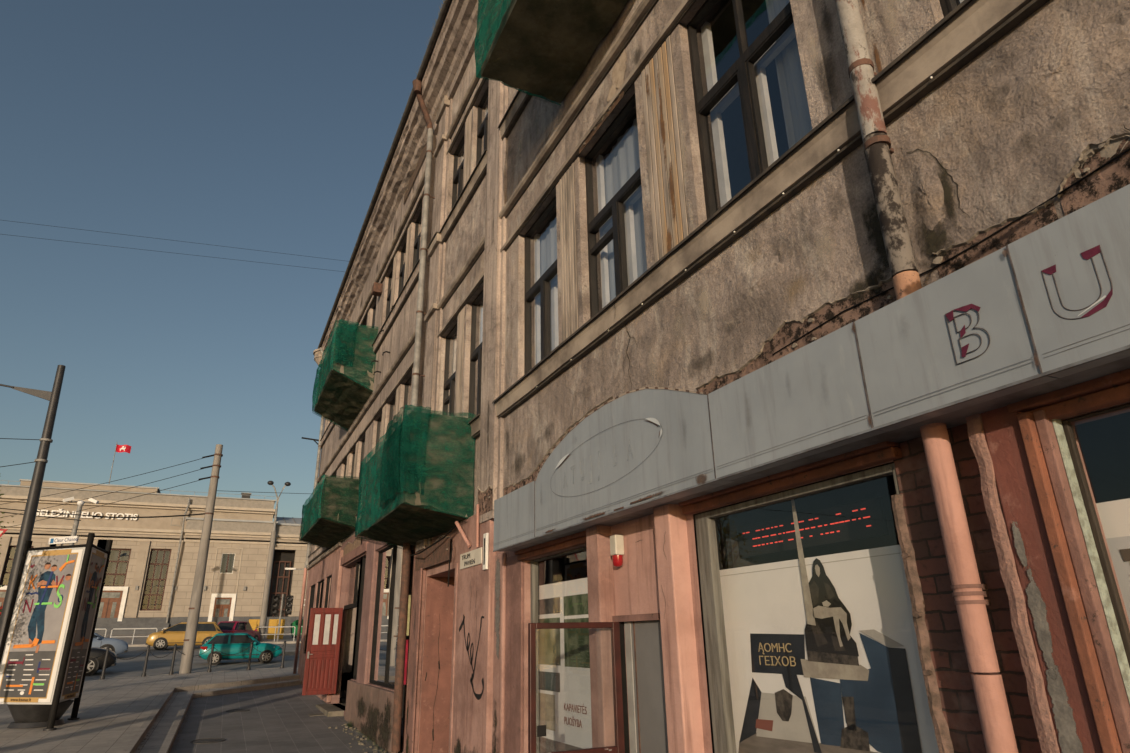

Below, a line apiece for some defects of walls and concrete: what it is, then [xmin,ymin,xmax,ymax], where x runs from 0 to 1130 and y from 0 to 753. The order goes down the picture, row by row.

corrosion [874,47,882,73]
crack [906,148,970,218]
flaking render [933,132,1130,279]
flaking render [696,276,897,395]
peeling [1012,522,1083,753]
leakage [358,697,392,749]